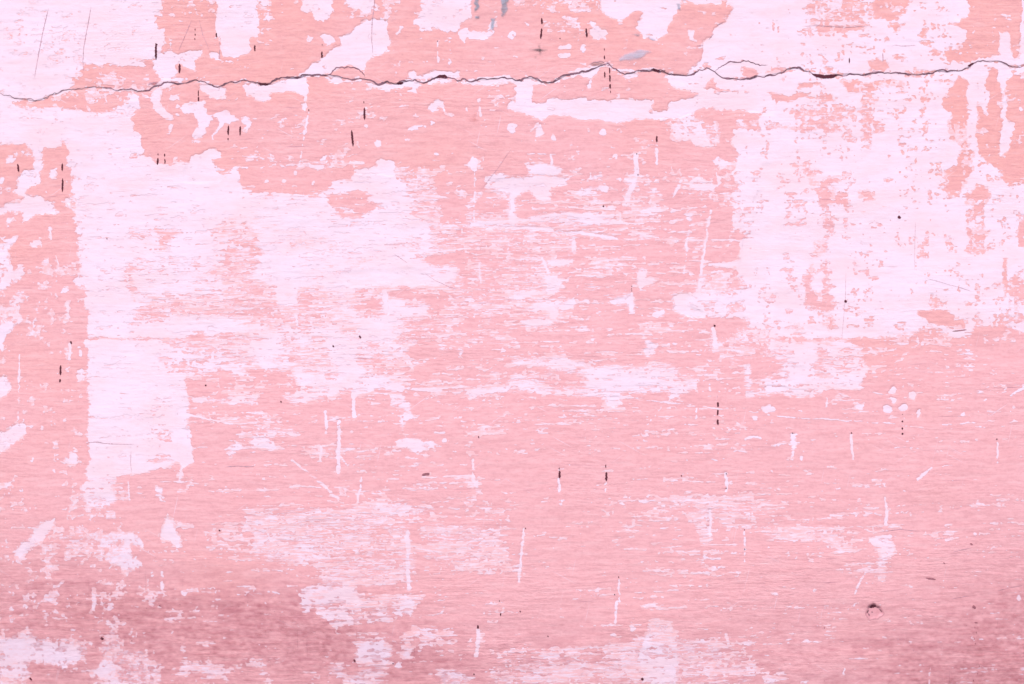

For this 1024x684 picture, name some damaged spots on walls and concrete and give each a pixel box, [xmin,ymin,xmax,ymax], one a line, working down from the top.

peeling [281,0,334,22]
peeling [413,0,499,47]
crack [2,1,1020,101]
peeling [404,99,455,141]
peeling [29,226,53,248]
peeling [0,374,67,454]